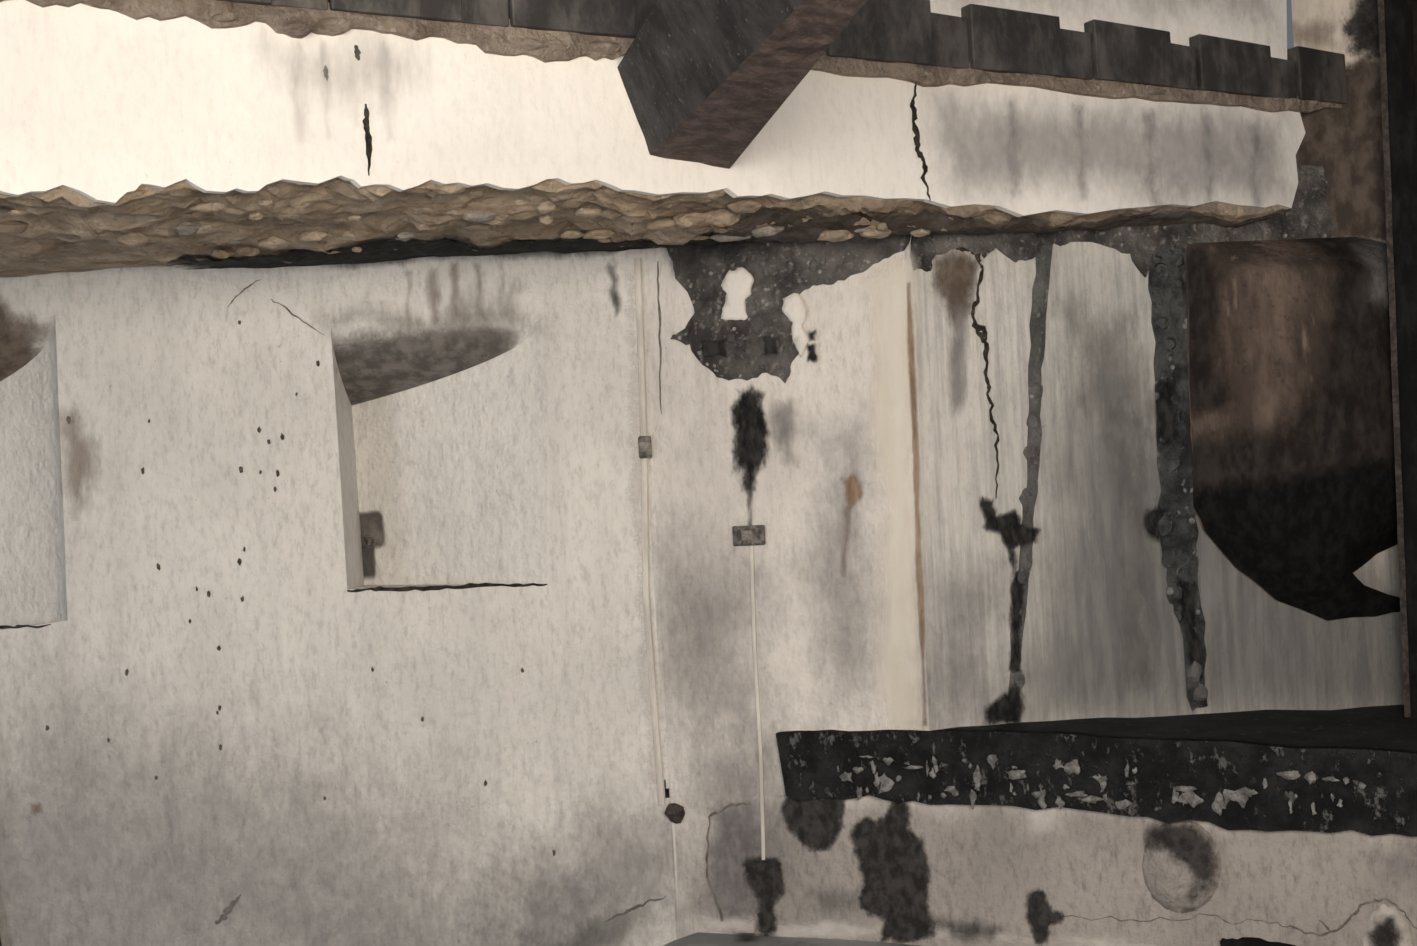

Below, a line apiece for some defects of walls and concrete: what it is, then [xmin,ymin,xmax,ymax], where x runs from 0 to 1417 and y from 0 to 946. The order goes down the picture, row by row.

crack [910,84,931,201]
spalling [0,165,1333,383]
leakage [935,253,976,401]
crack [956,247,1000,498]
rust [846,476,861,514]
leakage [1177,577,1204,679]
leakage [702,797,1064,944]